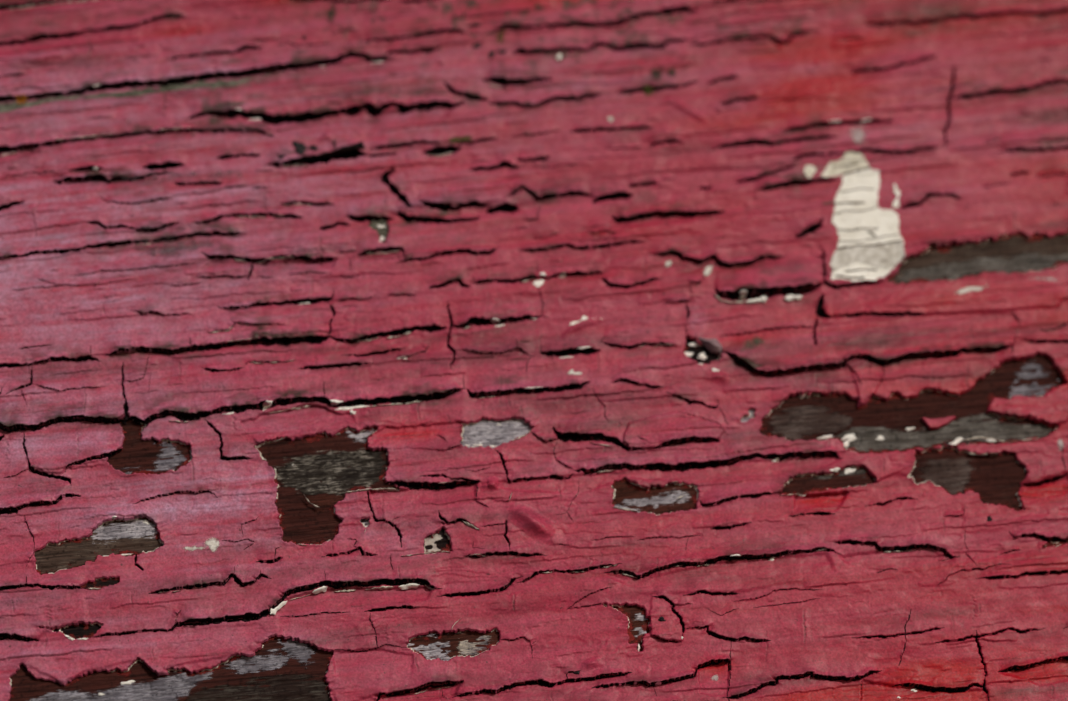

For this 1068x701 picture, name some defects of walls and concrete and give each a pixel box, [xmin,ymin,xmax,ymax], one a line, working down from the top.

crack [0,0,819,113]
crack [842,8,1068,40]
crack [0,75,760,204]
crack [709,54,1068,191]
peeling [887,232,1068,285]
peeling [106,415,192,475]
peeling [254,427,400,546]
crack [0,125,1068,653]
peeling [740,353,1066,512]
peeling [34,516,164,575]
peeling [9,635,333,701]
crack [376,588,1068,701]